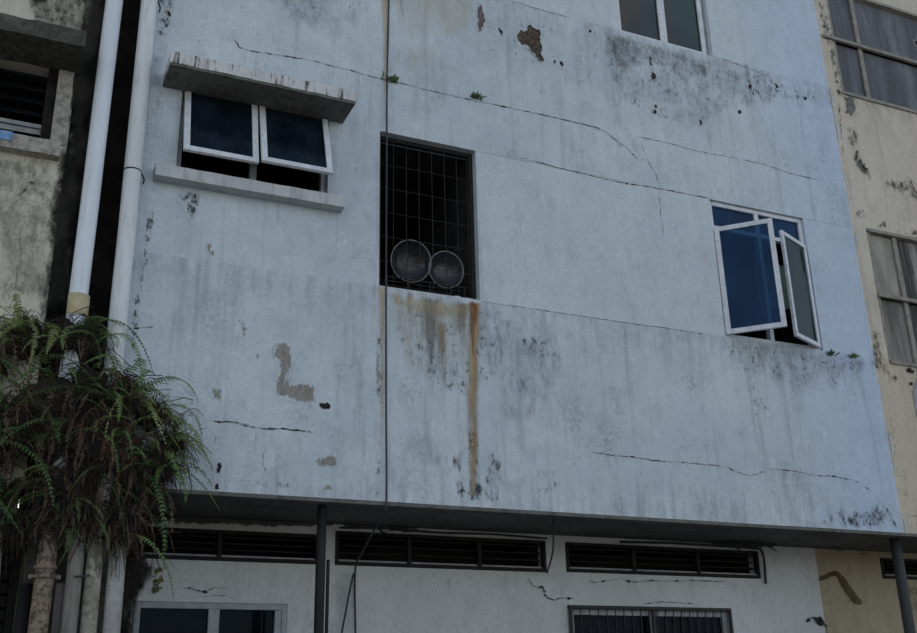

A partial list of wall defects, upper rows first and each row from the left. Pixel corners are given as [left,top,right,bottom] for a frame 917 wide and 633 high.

spalling [477,5,486,31]
spalling [517,25,564,66]
leakage [0,0,104,314]
crack [232,36,810,235]
peeling [272,342,330,409]
corrosion [457,302,479,492]
peeling [907,368,917,413]
crack [213,420,313,471]
leakage [830,503,896,527]
crack [528,578,575,601]
crack [589,579,729,604]
leakage [819,571,865,605]